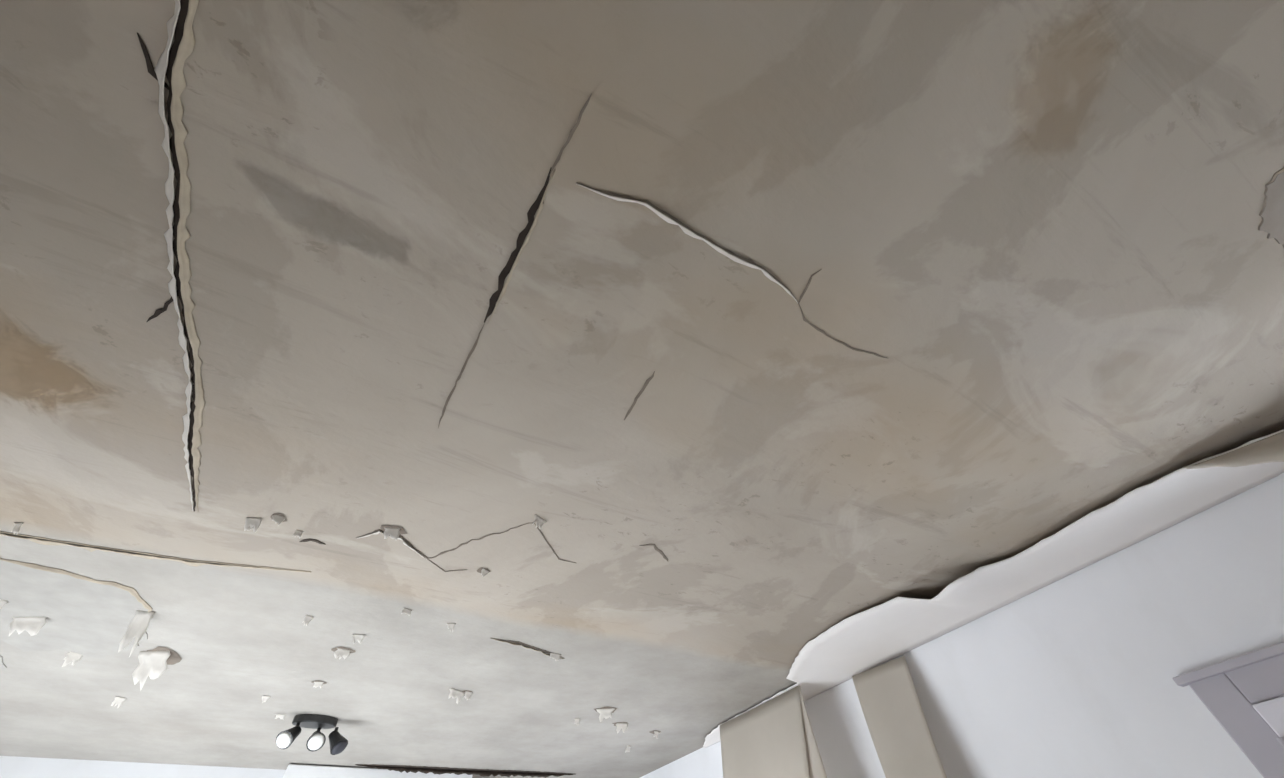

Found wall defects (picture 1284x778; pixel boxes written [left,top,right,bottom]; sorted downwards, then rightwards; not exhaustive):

crack [137,0,205,512]
crack [438,94,887,428]
peeling [1258,168,1284,247]